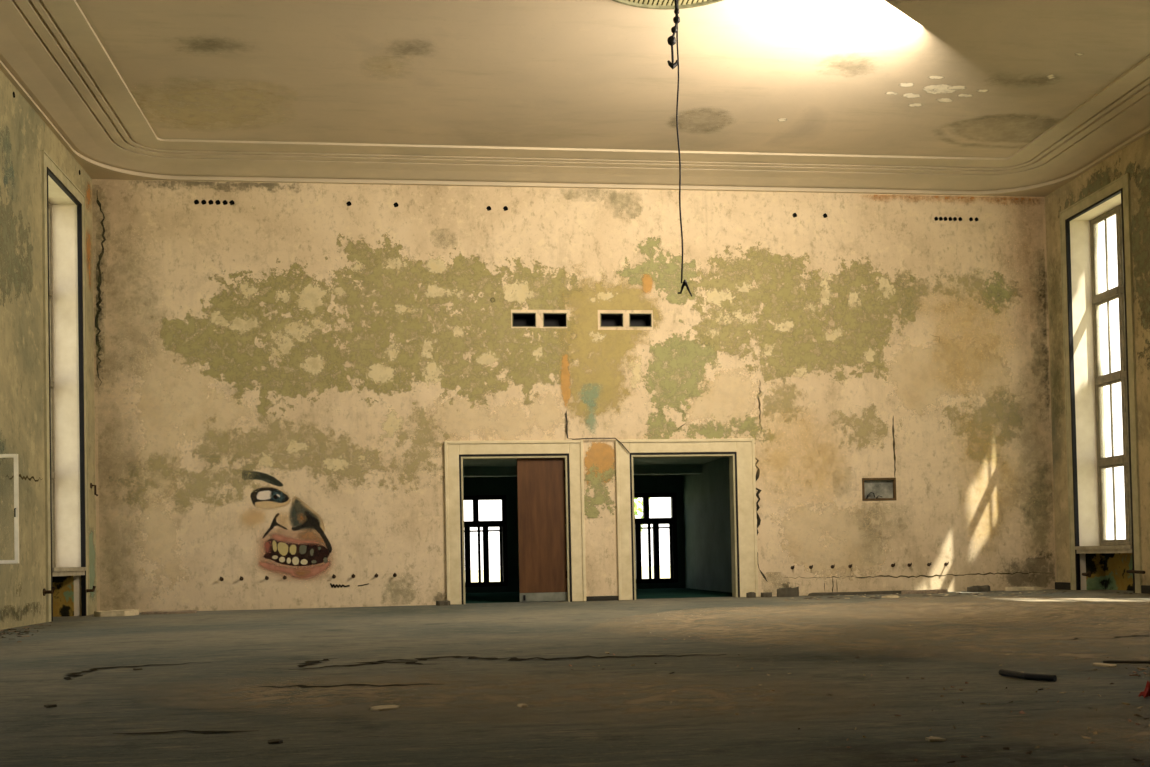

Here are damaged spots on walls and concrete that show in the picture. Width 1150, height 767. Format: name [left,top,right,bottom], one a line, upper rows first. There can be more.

peeling [886,75,988,107]
peeling [1058,159,1150,378]
peeling [119,233,1023,509]
crack [64,662,210,680]
crack [260,654,726,688]